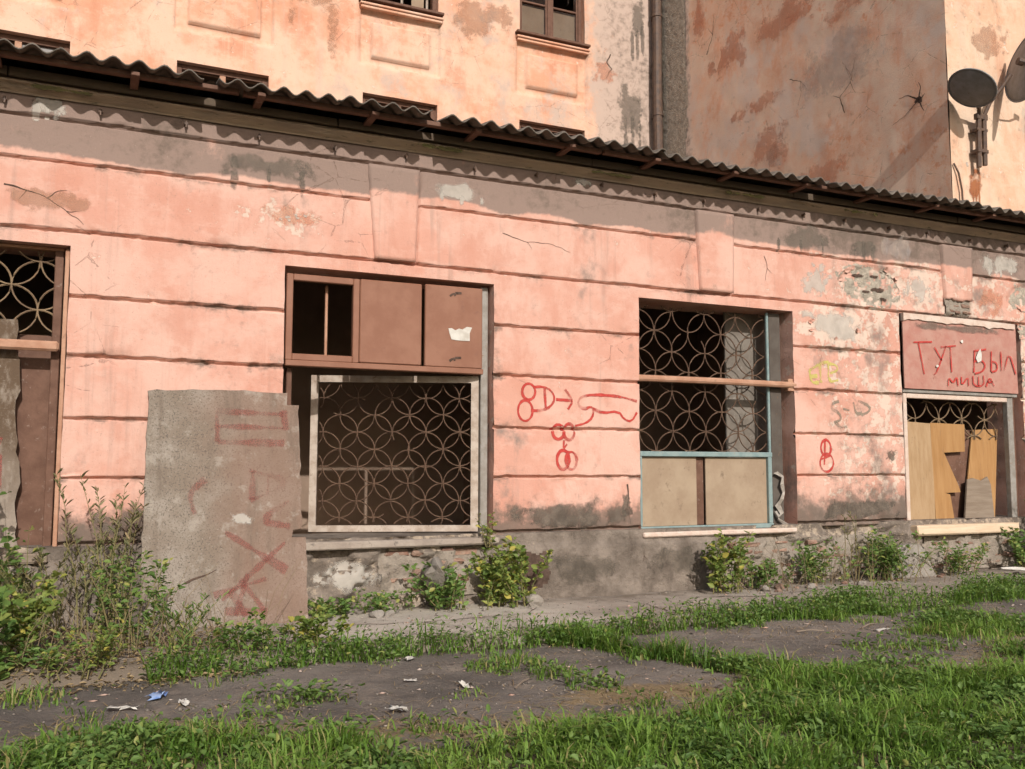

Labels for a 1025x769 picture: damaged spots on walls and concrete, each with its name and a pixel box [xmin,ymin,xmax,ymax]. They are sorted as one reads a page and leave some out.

leakage [630,2,645,59]
leakage [618,84,643,147]
crack [4,183,84,225]
peeling [803,311,859,341]
spalling [803,263,931,311]
flaking render [942,298,971,318]
spalling [1008,284,1025,340]
leakage [510,495,633,531]
flaking render [313,547,506,598]